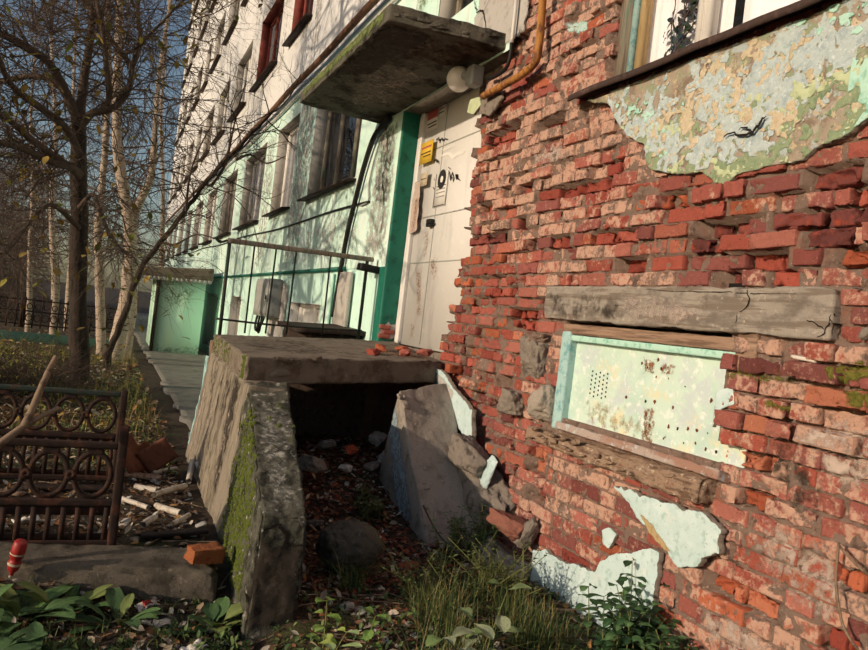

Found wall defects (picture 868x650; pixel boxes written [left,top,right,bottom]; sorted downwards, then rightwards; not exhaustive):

peeling [587,0,868,184]
crack [724,116,766,137]
crack [651,289,796,323]
crack [806,313,843,337]
rust [641,358,674,379]
rust [642,399,656,443]
spalling [486,508,526,542]